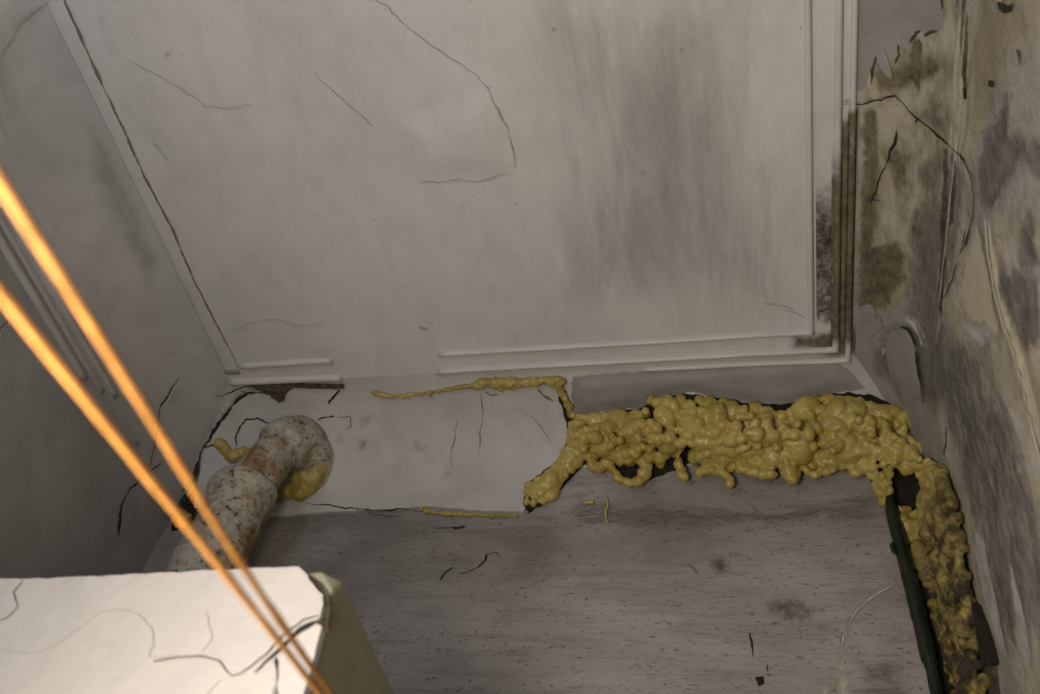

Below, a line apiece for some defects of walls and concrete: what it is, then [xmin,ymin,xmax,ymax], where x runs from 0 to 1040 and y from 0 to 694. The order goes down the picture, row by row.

crack [0,0,322,536]
crack [376,0,515,183]
leakage [796,110,903,355]
leakage [876,40,938,89]
peeling [855,0,982,356]
crack [843,88,1040,464]
leakage [960,0,968,88]
flaking render [245,383,345,403]
flaking render [615,443,701,481]
flaking render [870,461,921,511]
leakage [911,149,1040,664]
crack [0,609,324,694]